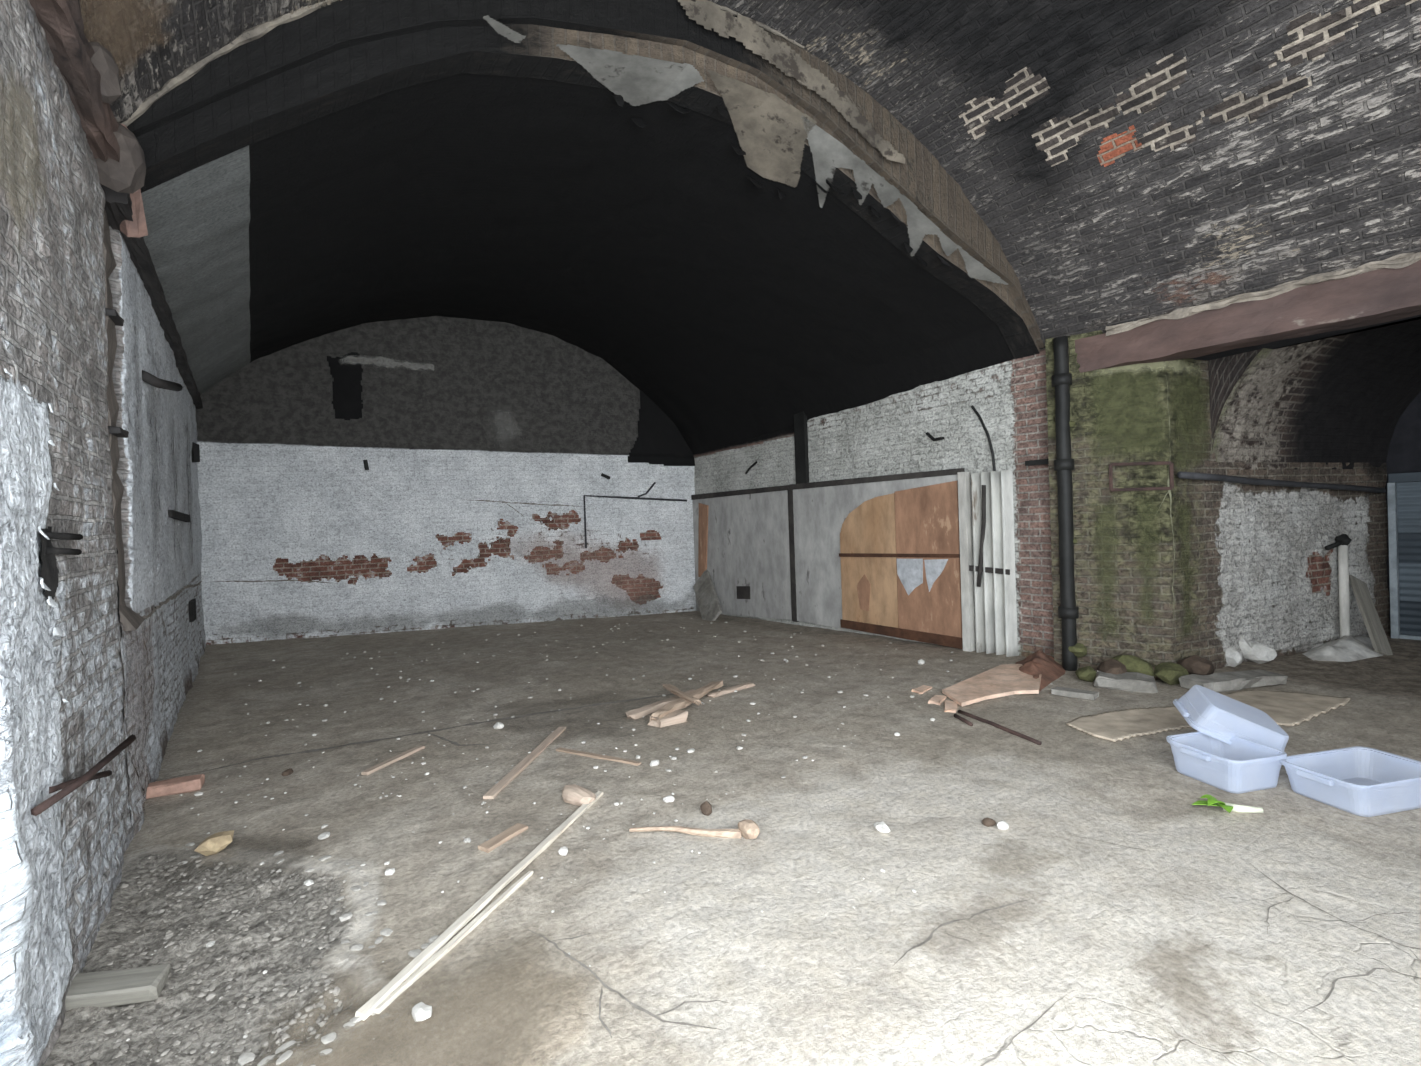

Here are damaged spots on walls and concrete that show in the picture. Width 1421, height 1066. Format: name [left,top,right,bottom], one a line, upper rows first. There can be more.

flaking render [483,15,526,43]
spalling [958,67,1050,140]
spalling [1031,0,1418,167]
flaking render [556,0,1008,285]
damp [1097,360,1201,373]
flaking render [273,510,663,605]
spalling [1306,549,1333,596]
crack [896,897,1037,963]
crack [1250,863,1421,1012]
crack [521,925,728,1038]
crack [981,996,1065,1066]